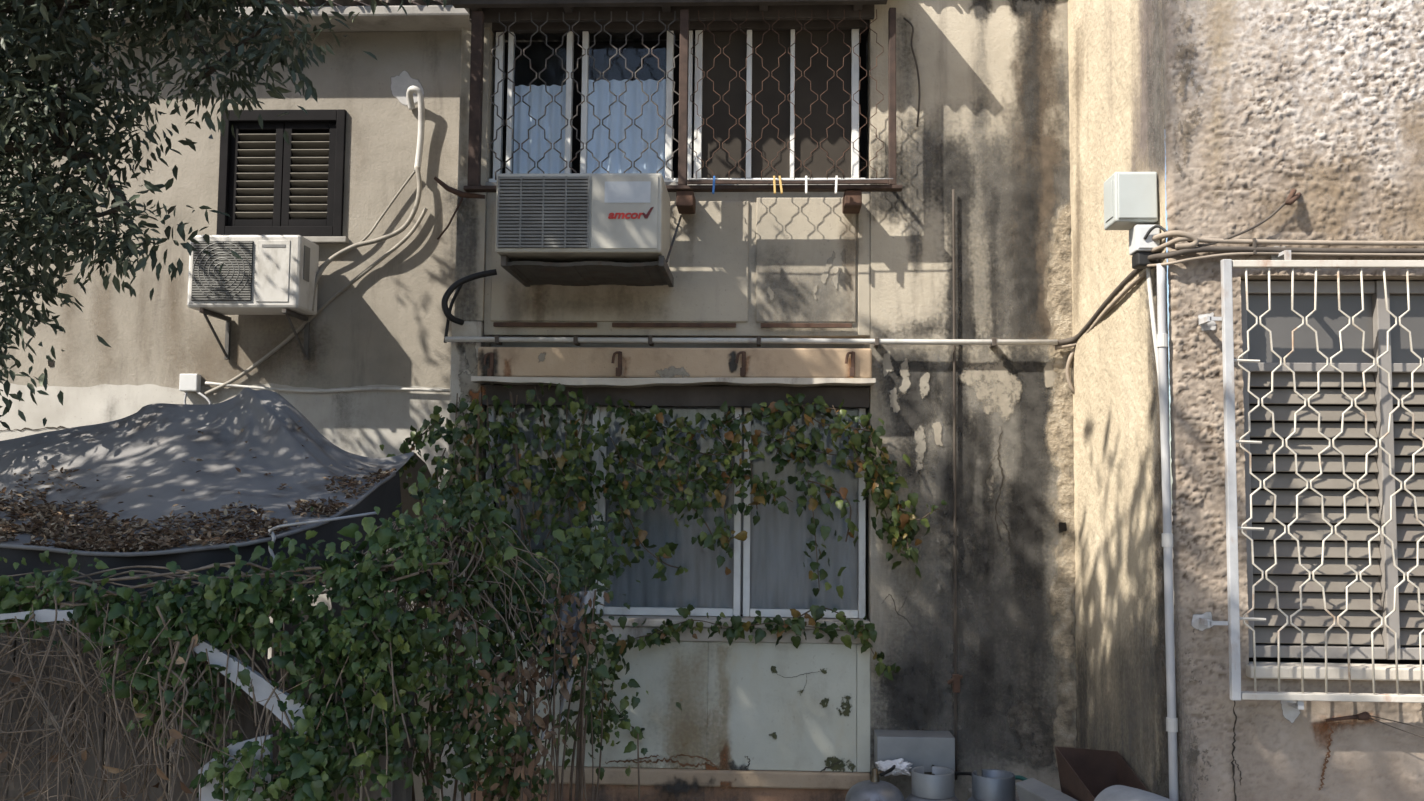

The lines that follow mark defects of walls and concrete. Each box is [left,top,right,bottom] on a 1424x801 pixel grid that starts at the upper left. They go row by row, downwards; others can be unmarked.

leakage [1132,0,1170,172]
leakage [765,265,841,323]
peeling [882,351,930,413]
leakage [869,0,1080,768]
peeling [958,360,1022,420]
peeling [915,421,943,471]
crack [1231,701,1242,801]